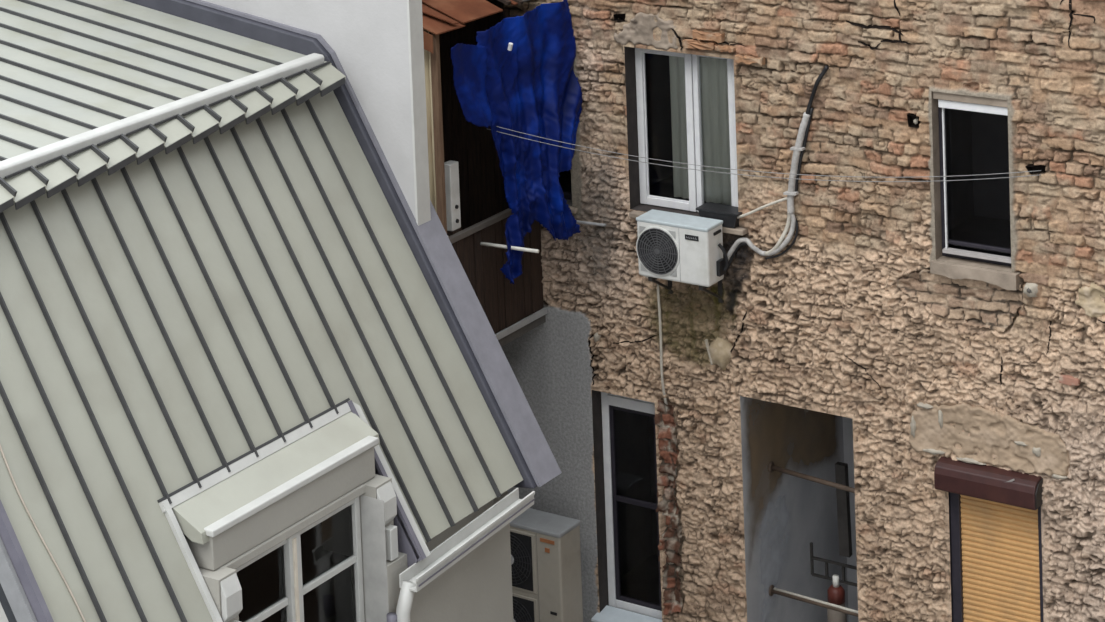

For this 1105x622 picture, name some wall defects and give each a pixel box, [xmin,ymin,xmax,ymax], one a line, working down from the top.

crack [1060,0,1095,48]
damp [651,225,753,363]
spalling [654,400,683,615]